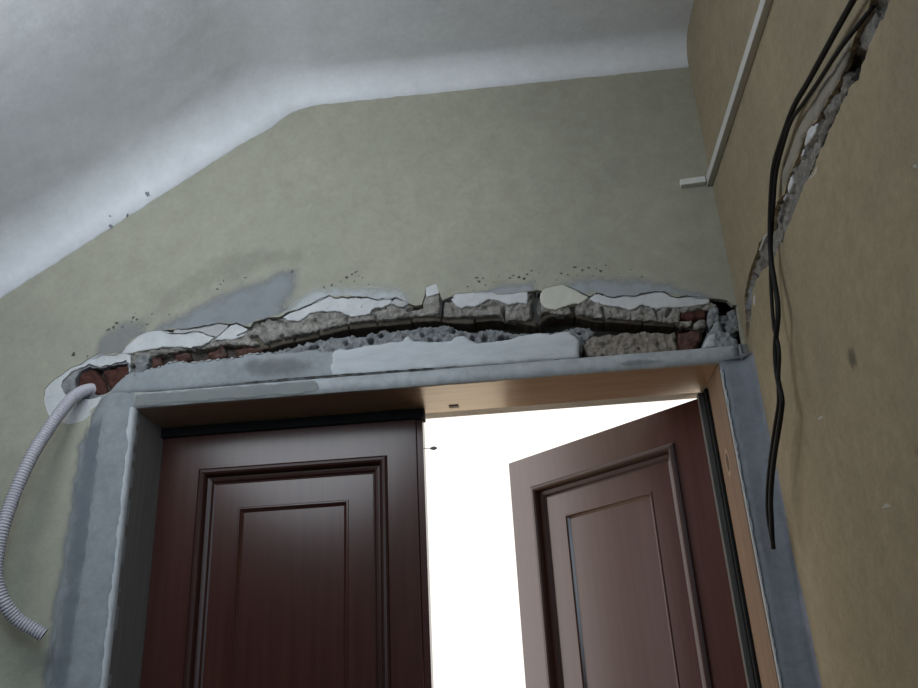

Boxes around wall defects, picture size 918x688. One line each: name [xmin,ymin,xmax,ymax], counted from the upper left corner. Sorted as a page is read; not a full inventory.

peeling [800,122,823,160]
peeling [783,175,797,202]
crack [162,295,400,337]
crack [438,291,454,316]
spalling [44,270,739,424]